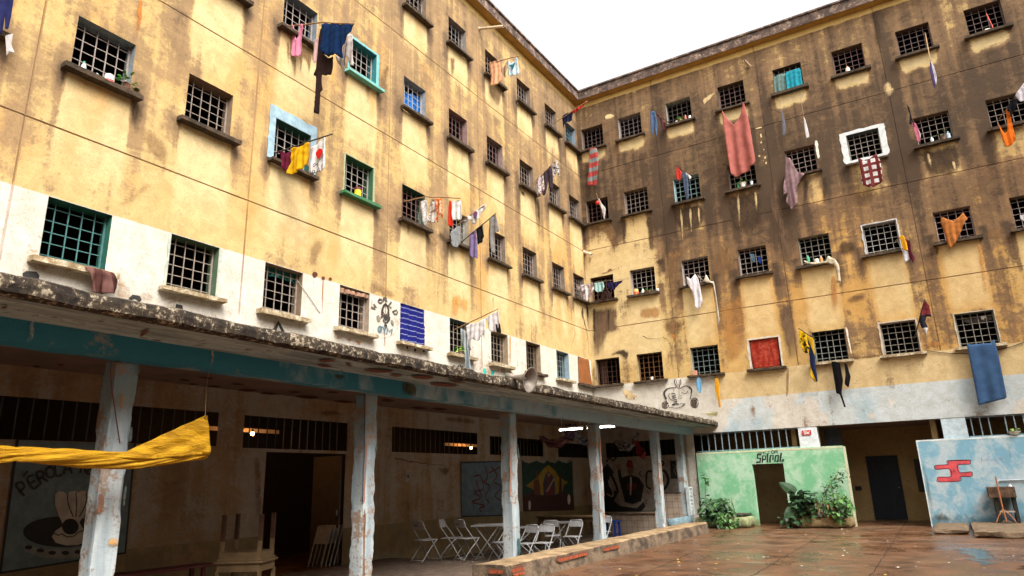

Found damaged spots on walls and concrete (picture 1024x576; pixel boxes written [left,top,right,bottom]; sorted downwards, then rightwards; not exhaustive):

damp [921,146,959,172]
damp [596,221,626,247]
damp [674,206,704,234]
damp [780,304,796,354]
spalling [363,443,377,576]